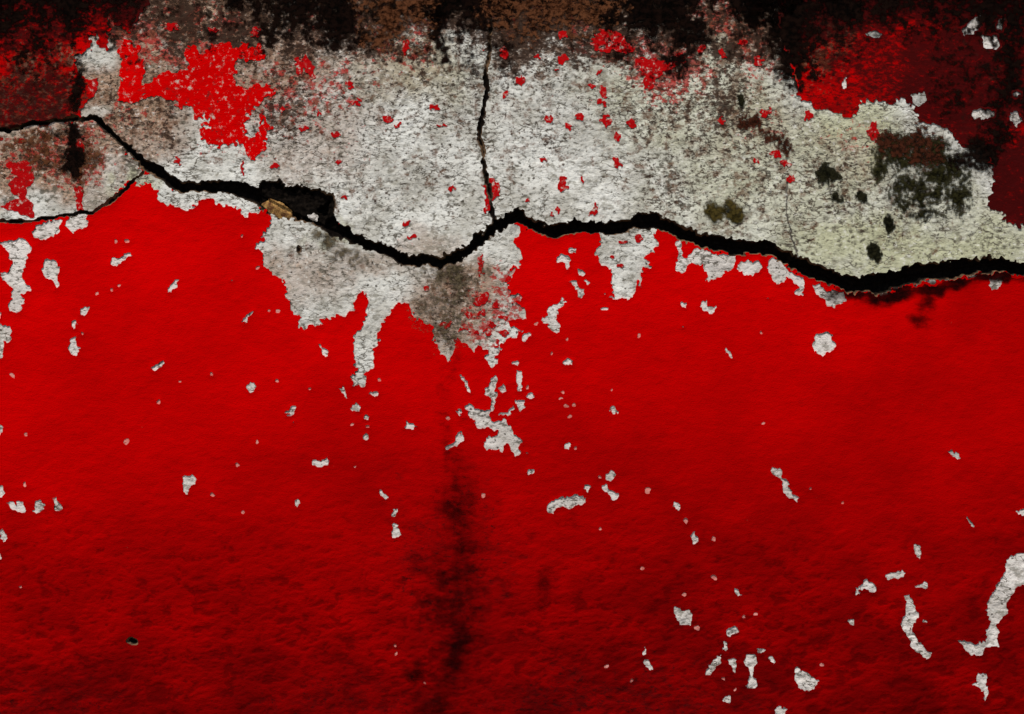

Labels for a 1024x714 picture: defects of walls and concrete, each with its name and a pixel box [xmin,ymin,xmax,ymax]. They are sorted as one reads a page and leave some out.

crack [0,114,262,225]
crack [334,0,1024,297]
peeling [0,0,1024,457]
peeling [547,470,619,513]
peeling [900,581,932,659]
peeling [958,553,1024,656]